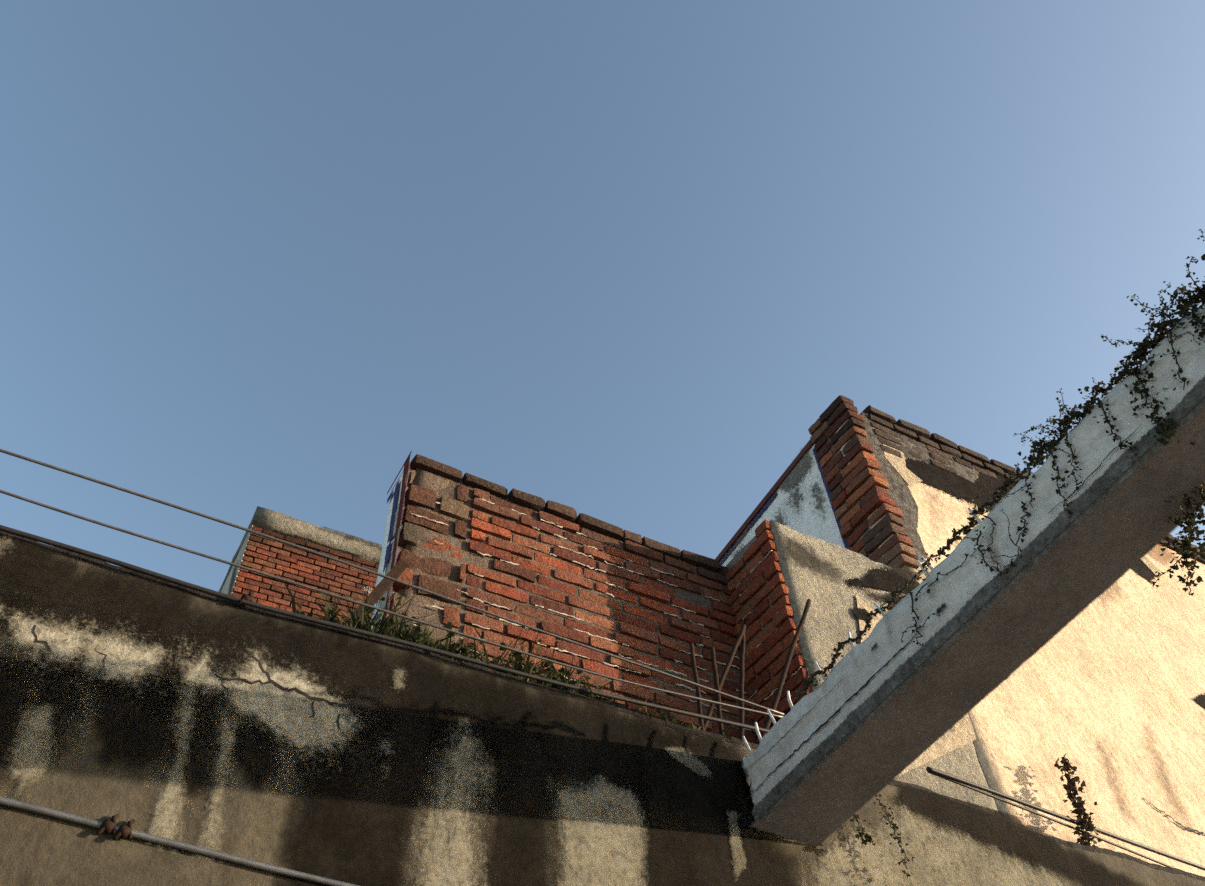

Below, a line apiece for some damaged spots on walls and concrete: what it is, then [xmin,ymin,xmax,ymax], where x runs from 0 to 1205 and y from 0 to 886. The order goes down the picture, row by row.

crack [215,656,351,729]
leakage [0,544,800,886]